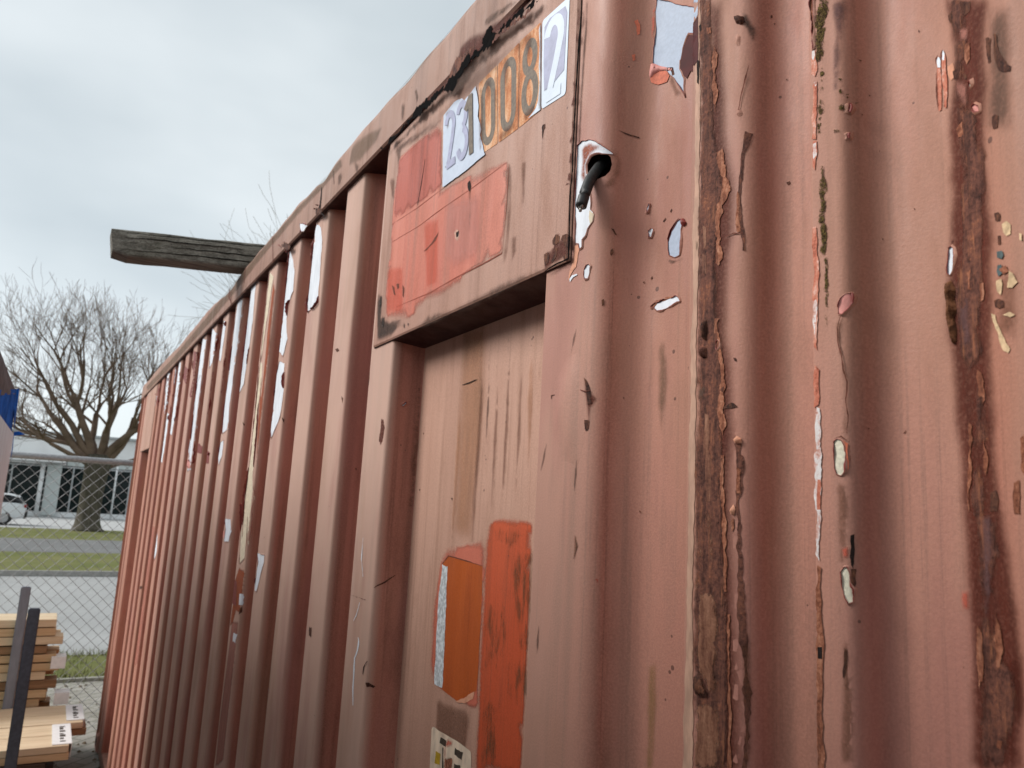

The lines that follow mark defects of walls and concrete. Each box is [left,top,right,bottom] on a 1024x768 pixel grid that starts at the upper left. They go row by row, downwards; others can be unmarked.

rust [428,7,531,100]
peeling [634,0,699,97]
rust [734,15,754,35]
peeling [299,204,323,313]
peeling [569,139,614,281]
peeling [650,294,681,313]
peeling [667,218,686,262]
rust [693,0,737,768]
rust [948,0,1021,768]
rust [1013,436,1024,514]
peeling [813,366,851,768]
peeling [840,534,858,605]